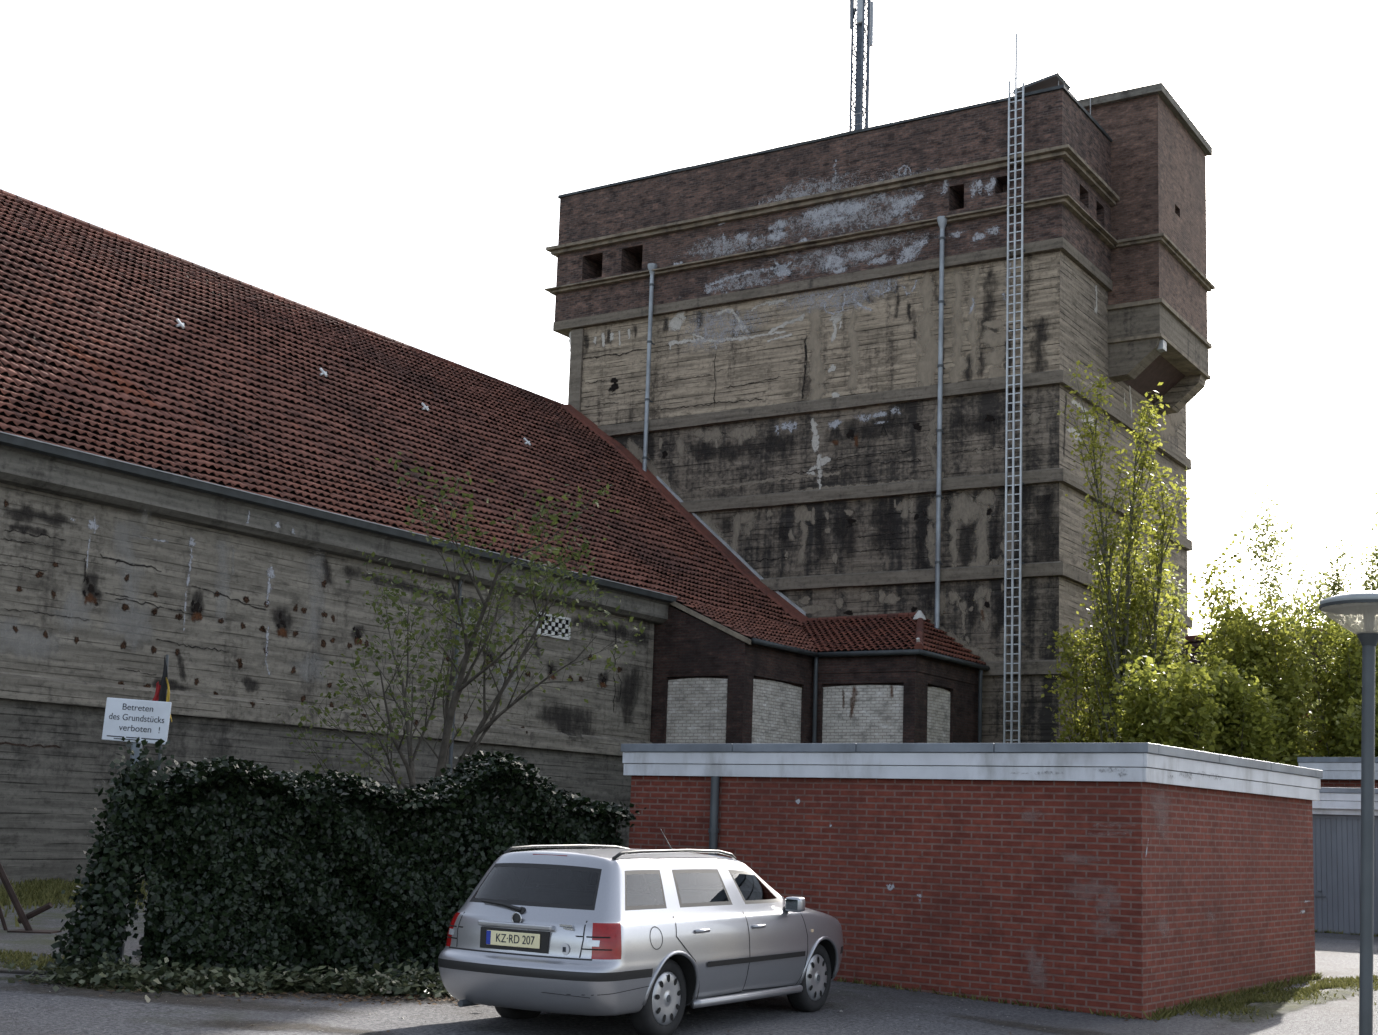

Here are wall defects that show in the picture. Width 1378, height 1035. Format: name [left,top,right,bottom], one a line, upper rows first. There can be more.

damp [964,263,1012,381]
damp [1031,318,1048,373]
damp [691,407,901,489]
damp [7,506,97,568]
damp [916,500,928,569]
damp [959,520,975,566]
damp [1033,490,1057,562]
spalling [83,574,100,604]
spalling [191,592,203,621]
spalling [274,609,291,637]
damp [994,597,1004,637]